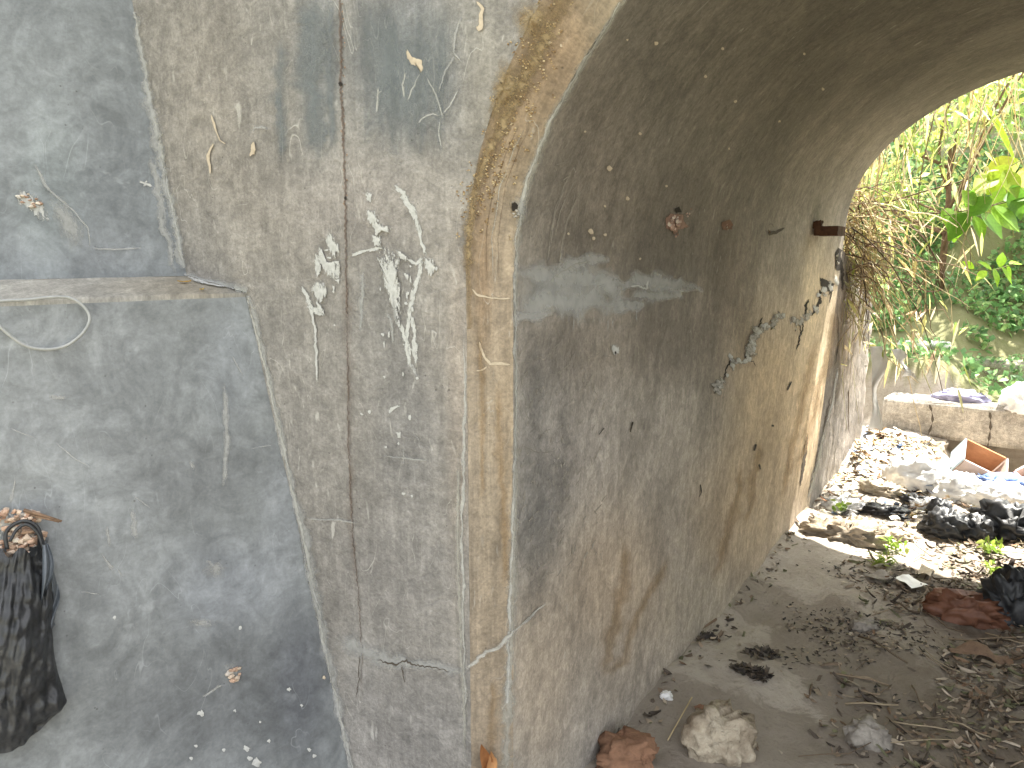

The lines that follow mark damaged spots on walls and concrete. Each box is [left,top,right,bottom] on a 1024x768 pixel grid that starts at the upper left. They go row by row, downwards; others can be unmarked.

crack [338,0,348,314]
crack [345,344,456,695]
leakage [456,0,626,768]
crack [711,276,840,496]